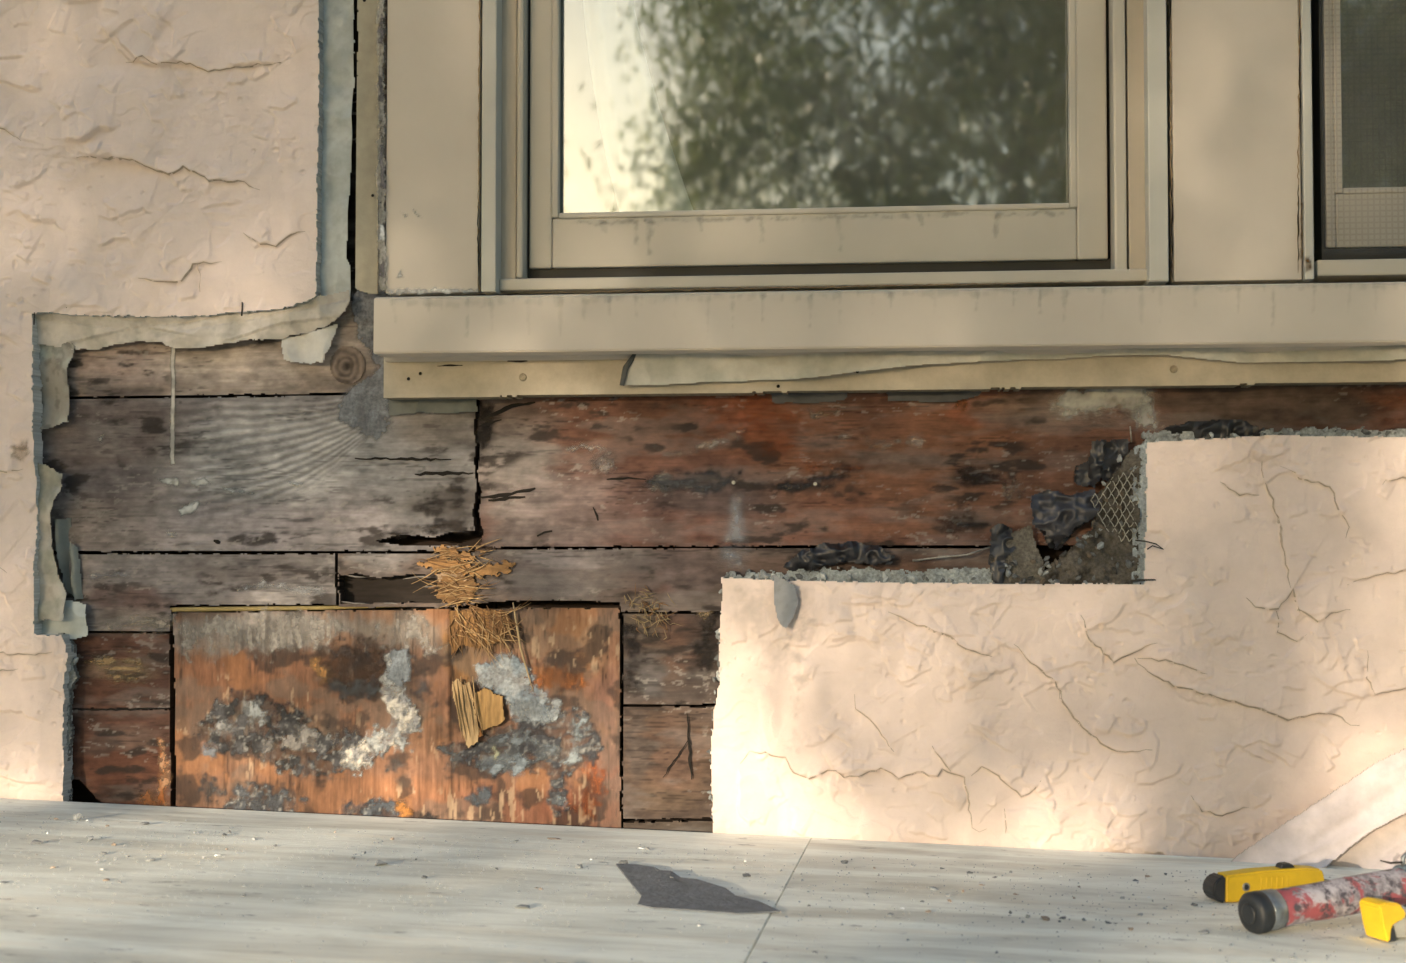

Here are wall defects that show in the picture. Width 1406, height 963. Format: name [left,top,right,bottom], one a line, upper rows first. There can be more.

crack [355,457,535,502]
spalling [719,566,1000,594]
spalling [58,633,82,821]
leakage [197,688,363,813]
leakage [130,613,441,705]
peeling [340,649,438,776]
leakage [342,798,438,820]
leakage [436,706,604,817]
spalling [706,629,720,763]